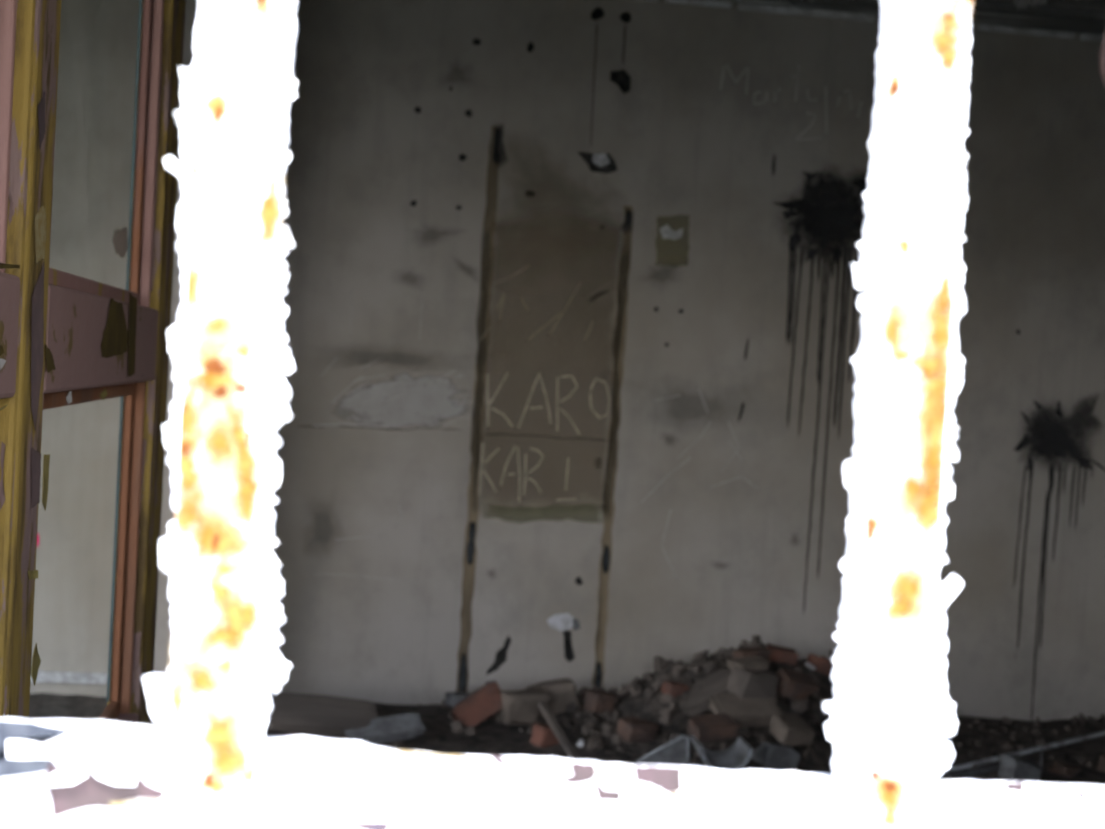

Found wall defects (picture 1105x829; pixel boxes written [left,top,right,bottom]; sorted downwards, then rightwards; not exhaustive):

corrosion [923,0,973,74]
corrosion [203,94,235,123]
corrosion [261,181,280,240]
peeling [31,204,56,431]
corrosion [209,317,225,332]
leakage [775,172,868,613]
corrosion [865,272,954,648]
corrosion [170,347,266,798]
leakage [1013,398,1105,721]
peeling [0,720,166,818]
peeling [397,750,472,760]
peeling [351,821,390,829]